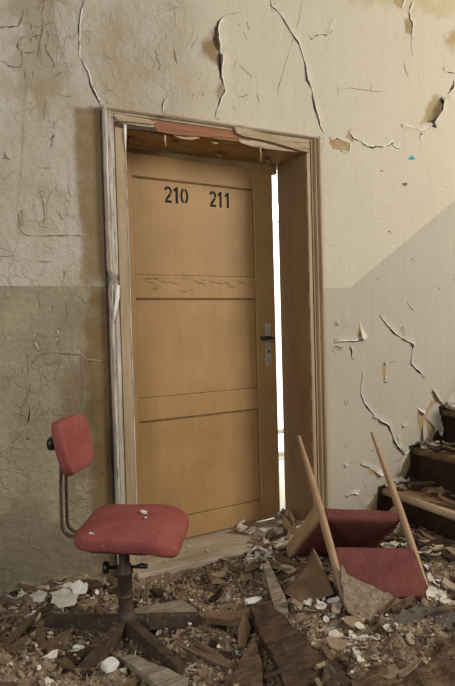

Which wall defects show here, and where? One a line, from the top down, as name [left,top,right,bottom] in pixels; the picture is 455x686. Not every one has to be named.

crack [78,0,108,106]
crack [192,12,259,120]
crack [270,0,336,151]
flaking render [329,133,354,154]
spalling [401,81,455,141]
peeling [332,323,368,360]
crack [379,312,426,379]
crack [361,371,411,462]
peeling [341,388,455,510]